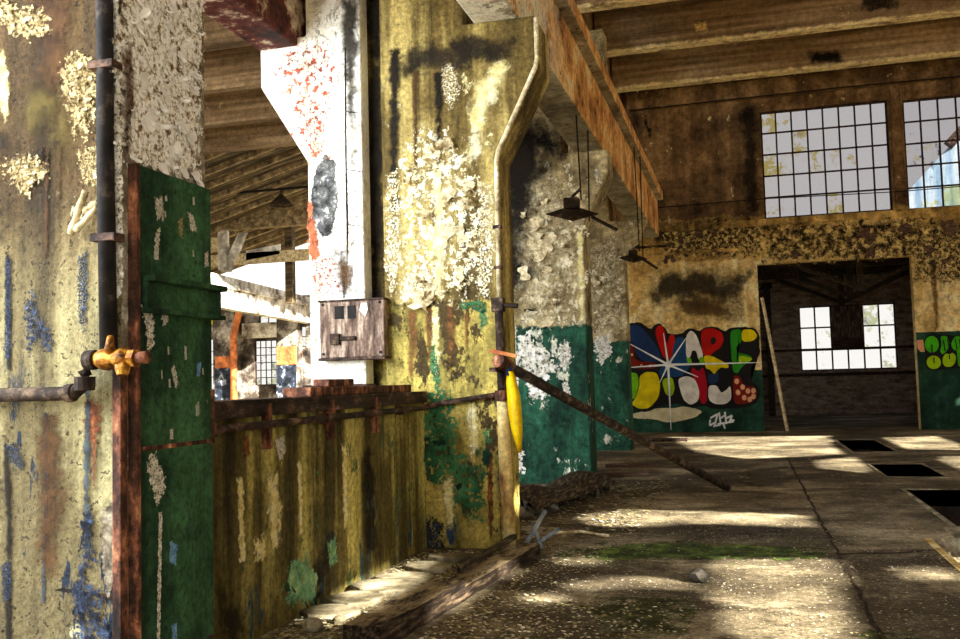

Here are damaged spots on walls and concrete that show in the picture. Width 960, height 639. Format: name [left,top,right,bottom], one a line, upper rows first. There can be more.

corrosion [83,399,104,486]
peeling [110,0,208,298]
leakage [373,359,381,385]
leakage [341,0,516,298]
peeling [383,124,496,331]
peeling [440,63,461,111]
peeling [424,345,499,523]
leakage [650,271,752,319]
peeling [514,167,960,405]
peeling [146,451,178,639]
crack [787,457,933,636]